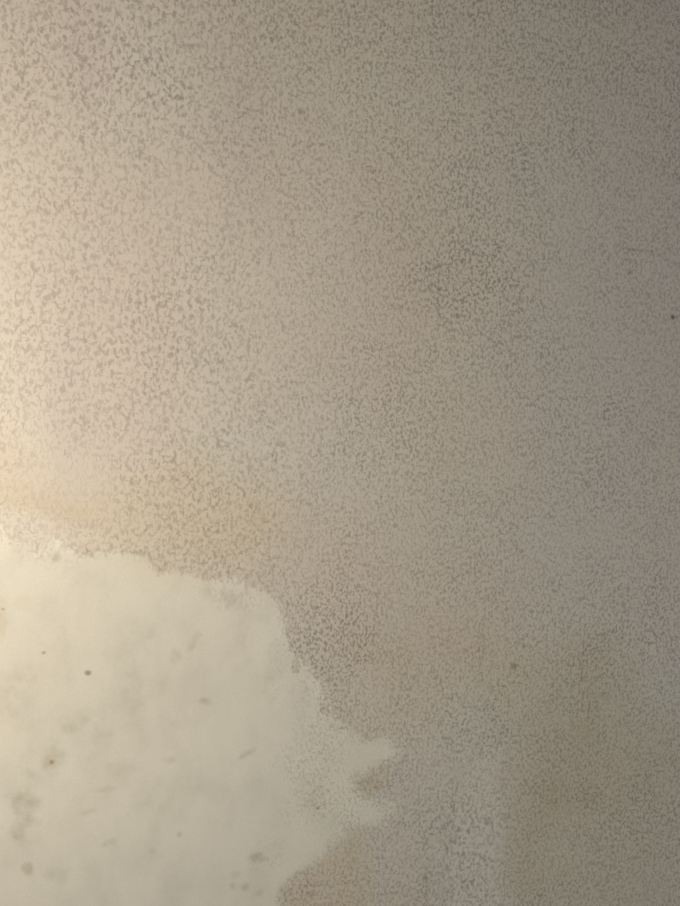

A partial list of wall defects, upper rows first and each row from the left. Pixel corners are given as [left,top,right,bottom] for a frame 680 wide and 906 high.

peeling [0,534,409,906]